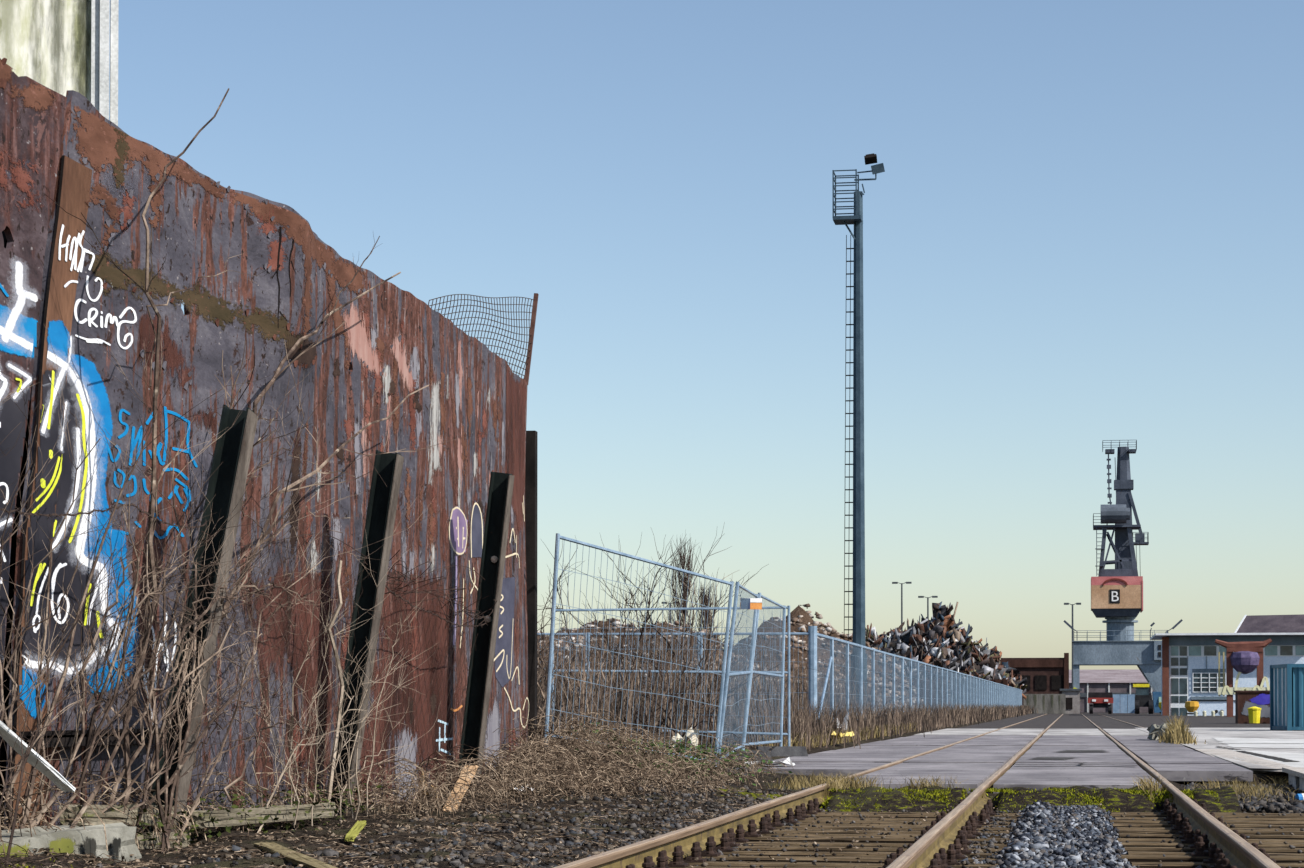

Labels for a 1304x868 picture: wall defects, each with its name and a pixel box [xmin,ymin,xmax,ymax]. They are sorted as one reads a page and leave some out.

rust [4,74,57,113]
rust [0,151,44,220]
rust [86,221,526,804]